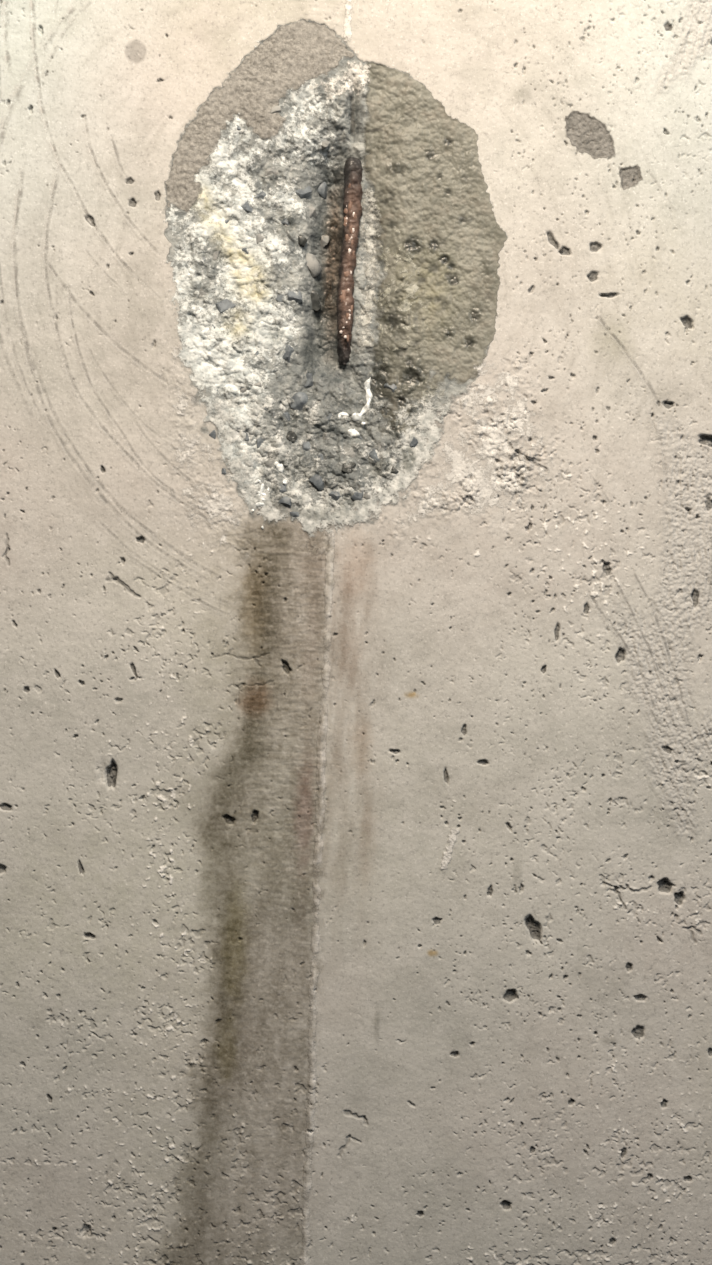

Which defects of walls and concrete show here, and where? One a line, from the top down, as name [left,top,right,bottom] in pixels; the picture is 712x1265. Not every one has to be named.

rust [344,184,357,256]
rust [340,271,353,320]
spalling [164,19,556,560]